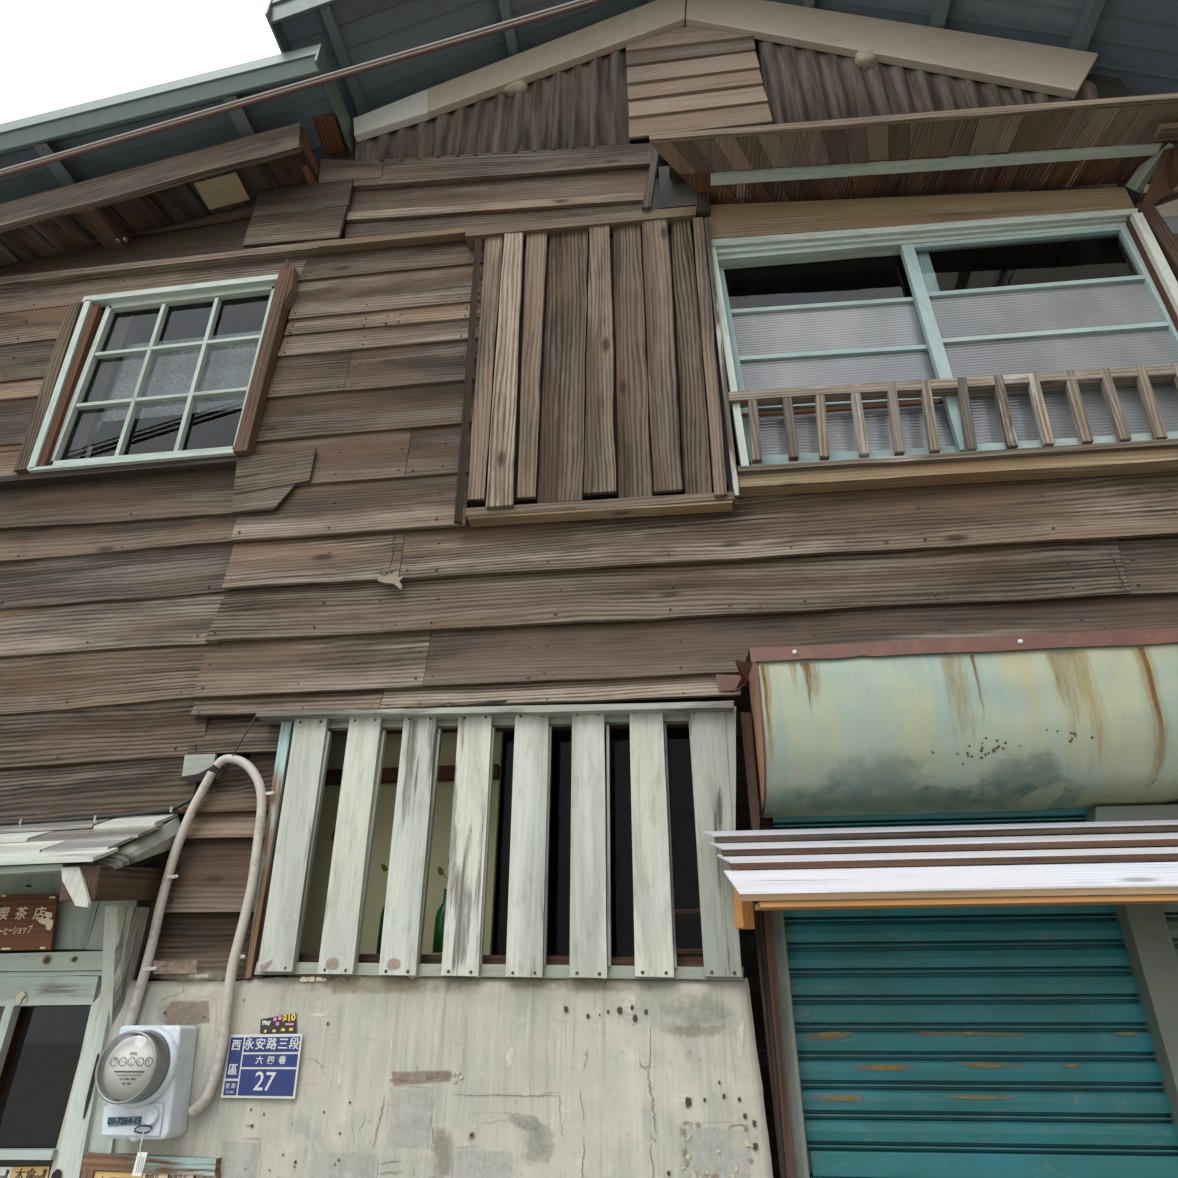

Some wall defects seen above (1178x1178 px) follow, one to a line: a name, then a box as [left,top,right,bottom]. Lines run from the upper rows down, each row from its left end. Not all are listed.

corrosion [761,665,769,720]
corrosion [801,662,811,701]
corrosion [1139,647,1163,735]
crack [451,1053,588,1178]
crack [640,1031,657,1178]
peeling [680,1120,757,1178]